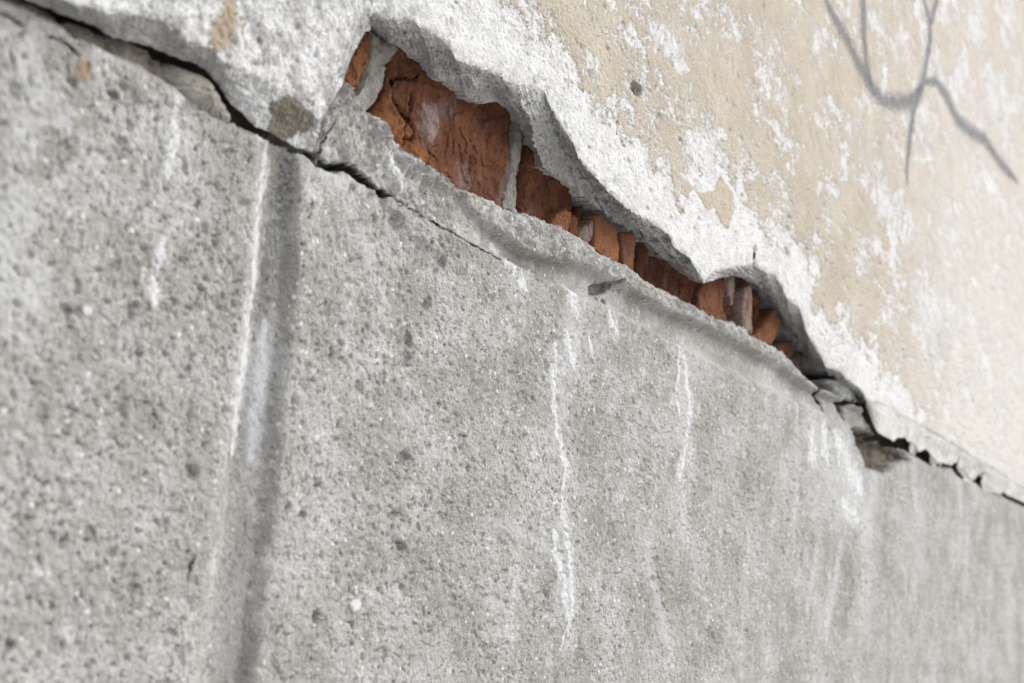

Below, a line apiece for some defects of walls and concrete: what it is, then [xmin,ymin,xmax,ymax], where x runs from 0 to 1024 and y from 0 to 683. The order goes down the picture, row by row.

crack [50,36,80,54]
crack [389,73,430,155]
crack [299,123,503,260]
spalling [348,14,866,403]
damp [562,286,580,320]
damp [607,308,619,336]
damp [674,343,694,490]
crack [811,389,851,412]
damp [549,329,594,651]